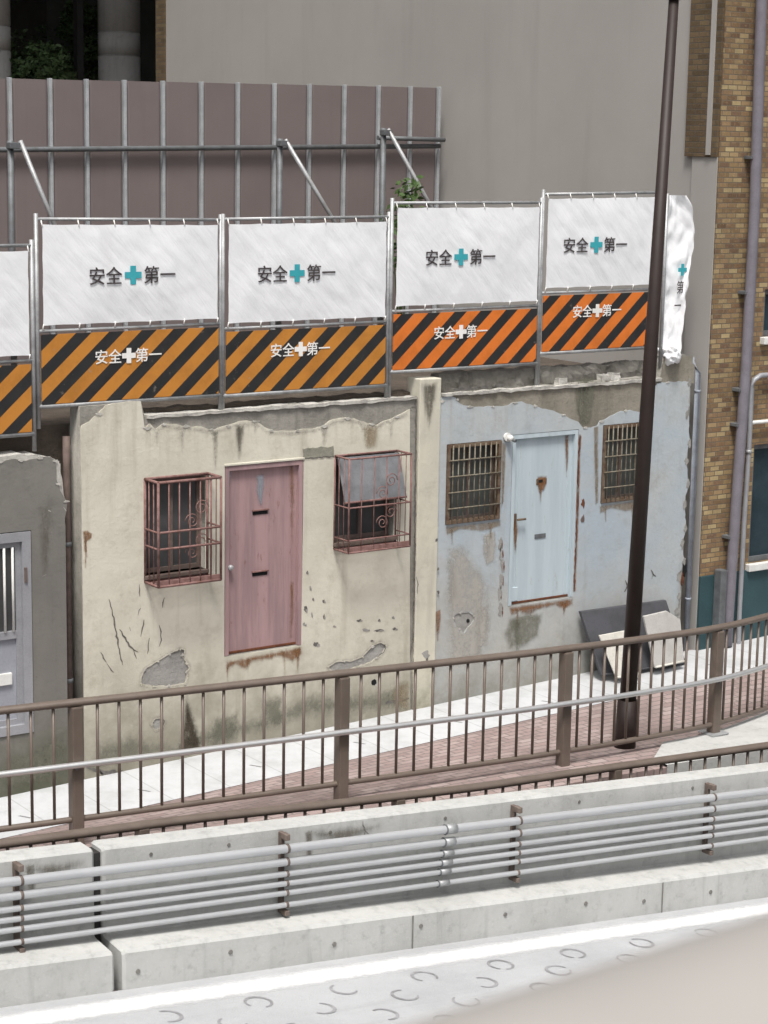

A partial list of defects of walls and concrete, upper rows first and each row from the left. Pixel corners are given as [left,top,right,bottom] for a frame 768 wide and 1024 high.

flaking render [144,399,417,432]
flaking render [441,383,642,429]
flaking render [655,356,695,419]
rust [511,435,581,614]
crack [101,585,164,672]
flaking render [140,649,188,687]
rust [228,648,301,667]
flaking render [328,616,398,670]
flaking render [453,612,475,633]